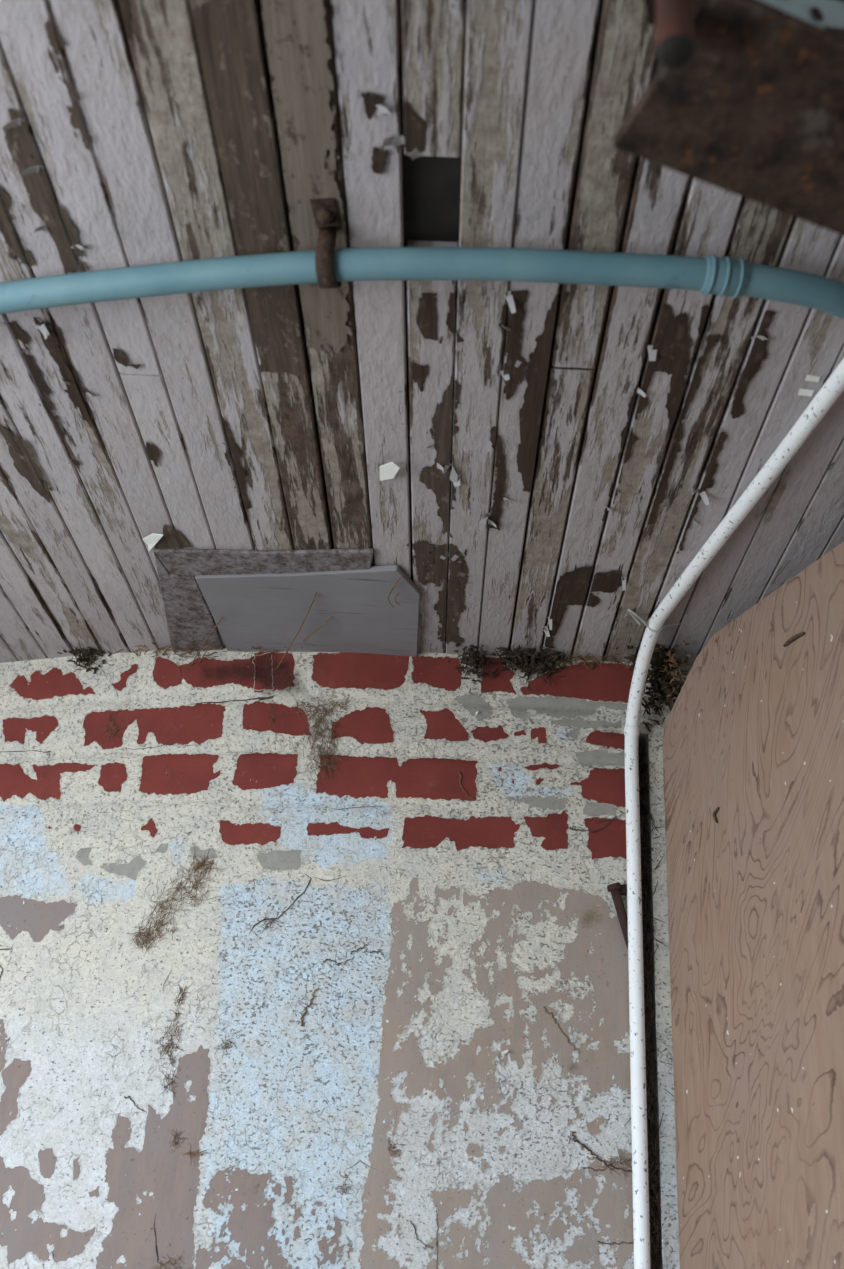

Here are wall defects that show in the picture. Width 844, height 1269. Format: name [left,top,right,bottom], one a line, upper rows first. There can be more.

rust [644,0,656,26]
rust [811,7,844,37]
peeling [189,0,352,256]
peeling [3,317,94,468]
peeling [244,282,353,376]
peeling [416,292,464,343]
peeling [479,290,569,531]
peeling [602,303,720,525]
peeling [730,310,775,419]
peeling [0,378,635,872]
peeling [75,817,170,882]
peeling [0,876,634,1269]